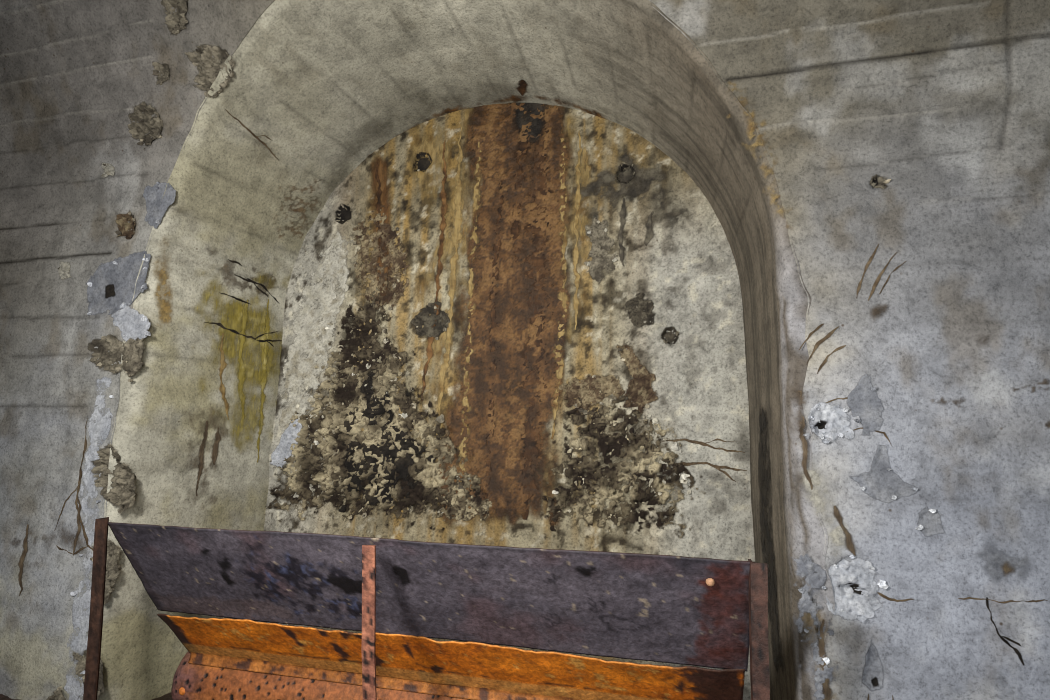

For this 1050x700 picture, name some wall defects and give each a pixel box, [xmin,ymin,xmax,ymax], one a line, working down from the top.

spalling [127,101,163,149]
spalling [185,44,235,98]
damp [497,80,527,102]
peeling [115,182,176,239]
damp [194,259,279,496]
damp [413,100,475,427]
rust [439,102,571,526]
damp [538,97,689,338]
crack [54,421,93,555]
peeling [46,251,151,700]
spalling [794,554,913,700]
crack [958,596,1048,604]